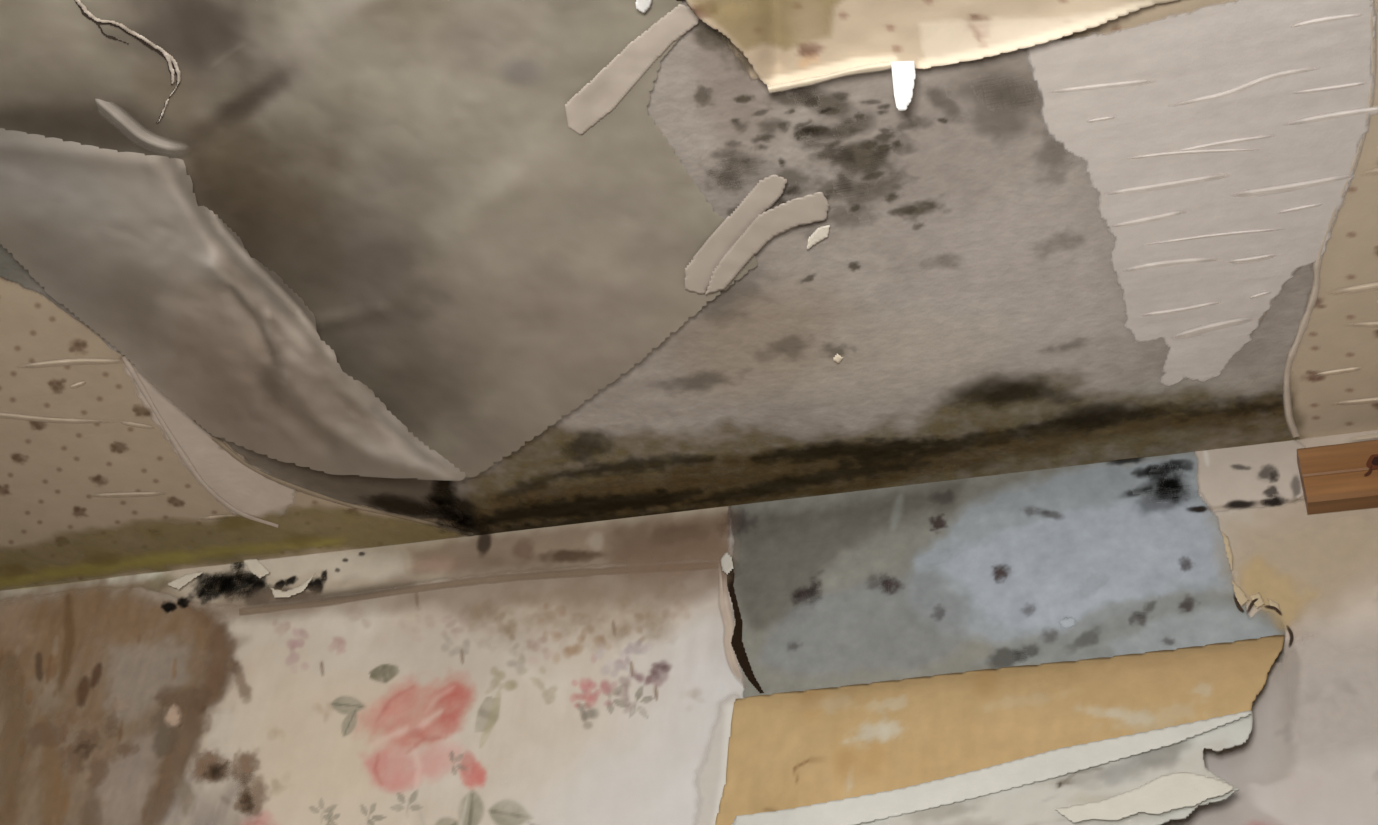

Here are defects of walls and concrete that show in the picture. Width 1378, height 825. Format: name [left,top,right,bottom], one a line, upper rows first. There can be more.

crack [74,0,181,123]
damp [773,89,899,178]
peeling [0,244,100,335]
damp [887,195,936,215]
peeling [531,0,1378,458]
damp [0,382,1299,825]
spalling [0,356,1305,698]
damp [1239,547,1322,626]